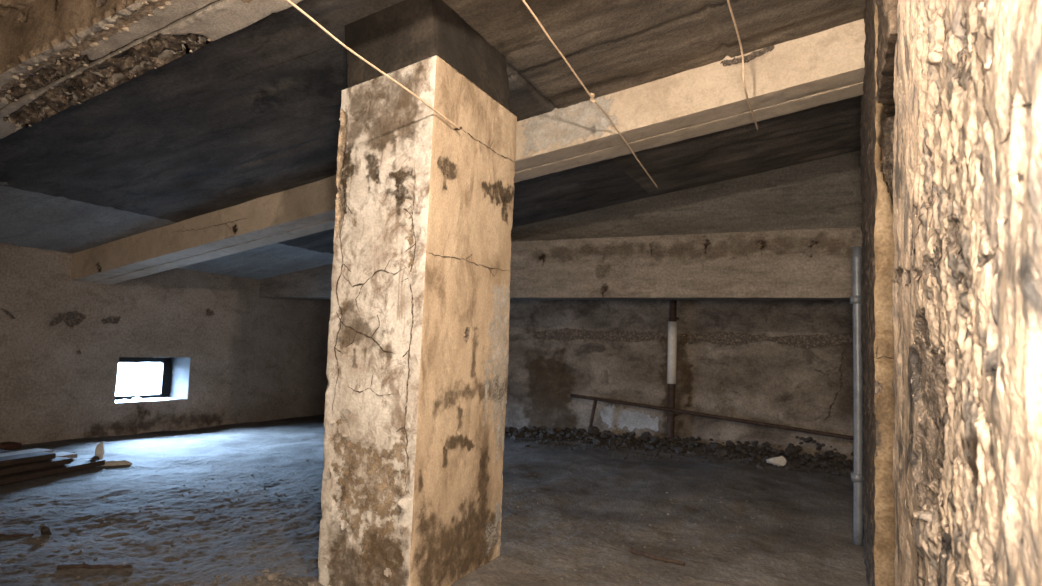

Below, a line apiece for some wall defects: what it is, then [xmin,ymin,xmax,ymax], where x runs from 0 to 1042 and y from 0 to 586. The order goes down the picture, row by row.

spalling [0,0,211,130]
crack [975,52,1032,144]
leakage [437,158,457,190]
leakage [482,180,515,222]
spalling [879,112,895,203]
leakage [339,304,373,342]
crack [332,172,511,493]
leakage [524,349,576,432]
spalling [909,306,948,513]
leakage [329,339,507,586]